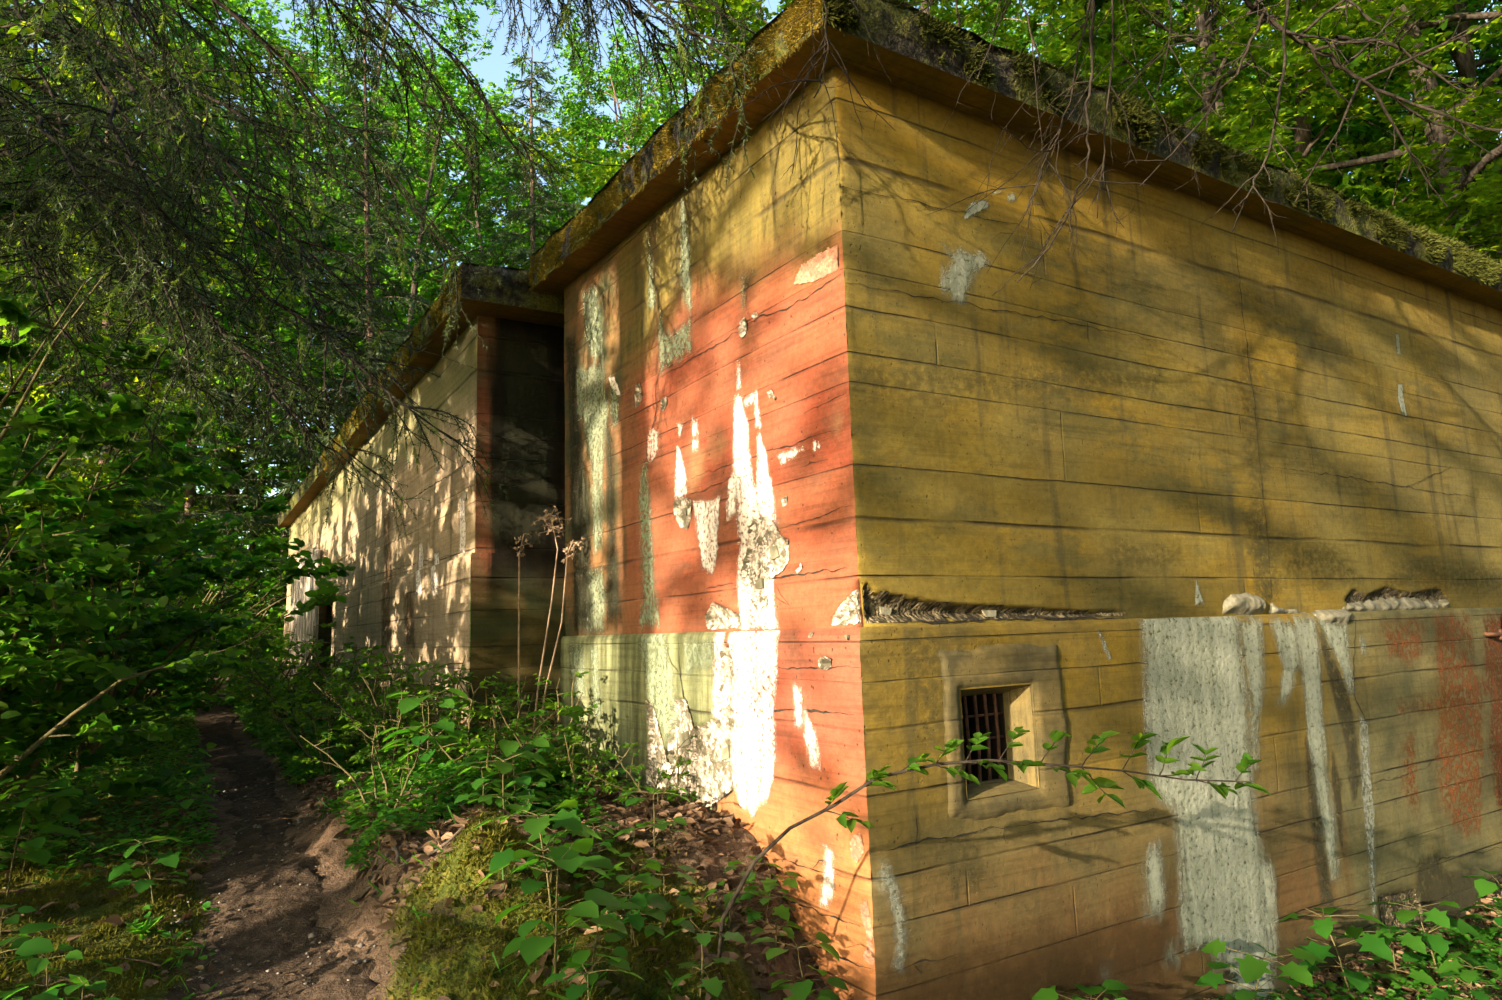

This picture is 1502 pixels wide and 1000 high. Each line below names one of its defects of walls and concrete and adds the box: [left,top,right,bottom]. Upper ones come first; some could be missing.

damp [648,202,692,370]
spalling [634,383,643,409]
spalling [673,497,692,530]
damp [486,288,820,814]
spalling [832,583,1126,640]
spalling [645,515,802,808]
spalling [818,656,832,671]
corrosion [1385,615,1502,832]
damp [822,849,834,905]